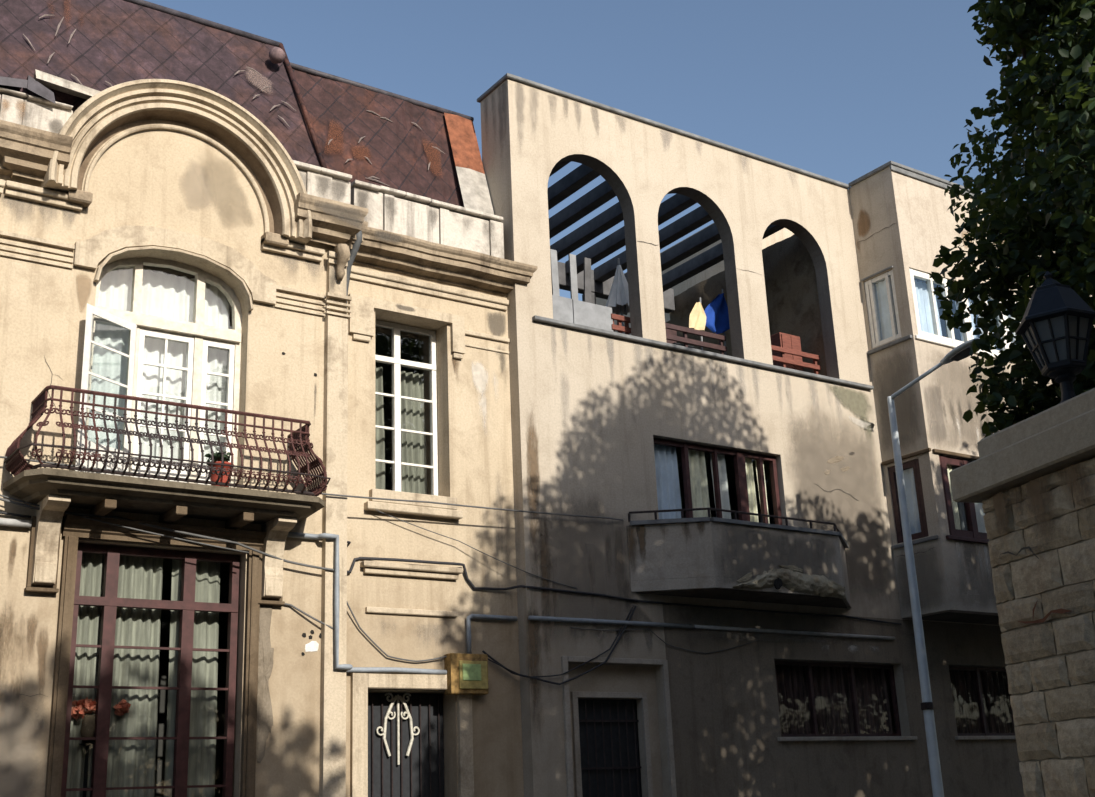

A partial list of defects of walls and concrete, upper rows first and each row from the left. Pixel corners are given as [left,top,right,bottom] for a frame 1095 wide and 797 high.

leakage [527,427,556,706]
leakage [622,525,646,563]
crack [1018,600,1071,624]
leakage [28,619,47,687]